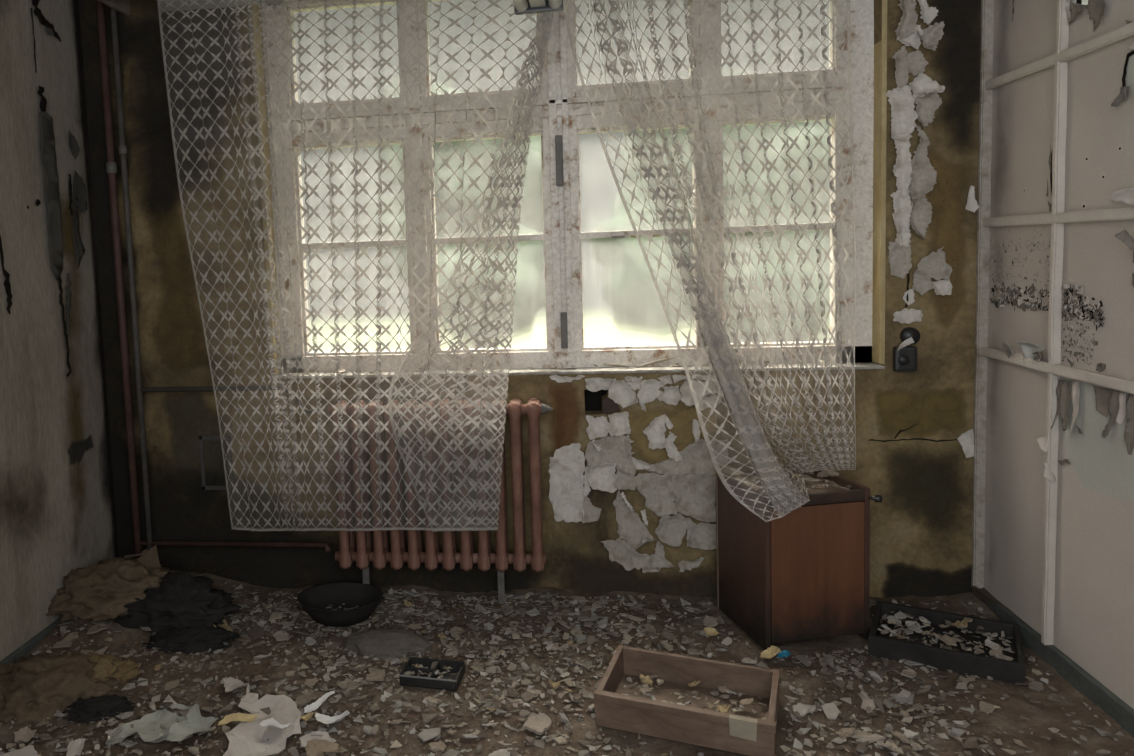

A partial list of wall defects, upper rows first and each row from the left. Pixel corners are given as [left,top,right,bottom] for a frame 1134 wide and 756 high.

hole [1066,0,1106,31]
peeling [886,0,953,324]
peeling [548,374,734,573]
damp [892,453,962,526]
damp [883,563,973,598]